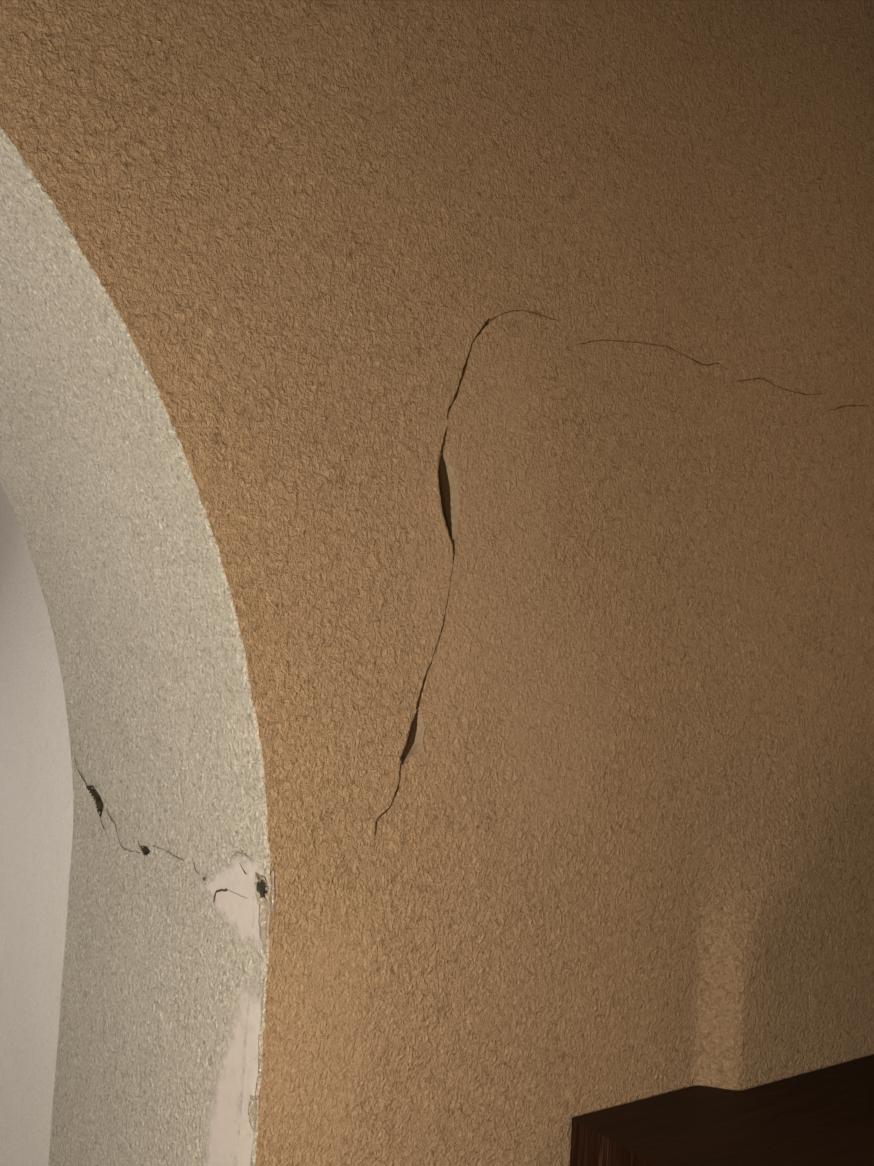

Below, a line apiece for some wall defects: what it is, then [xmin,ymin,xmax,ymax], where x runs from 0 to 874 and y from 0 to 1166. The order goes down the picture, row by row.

crack [374,310,868,841]
crack [74,758,259,903]
spalling [256,870,275,949]